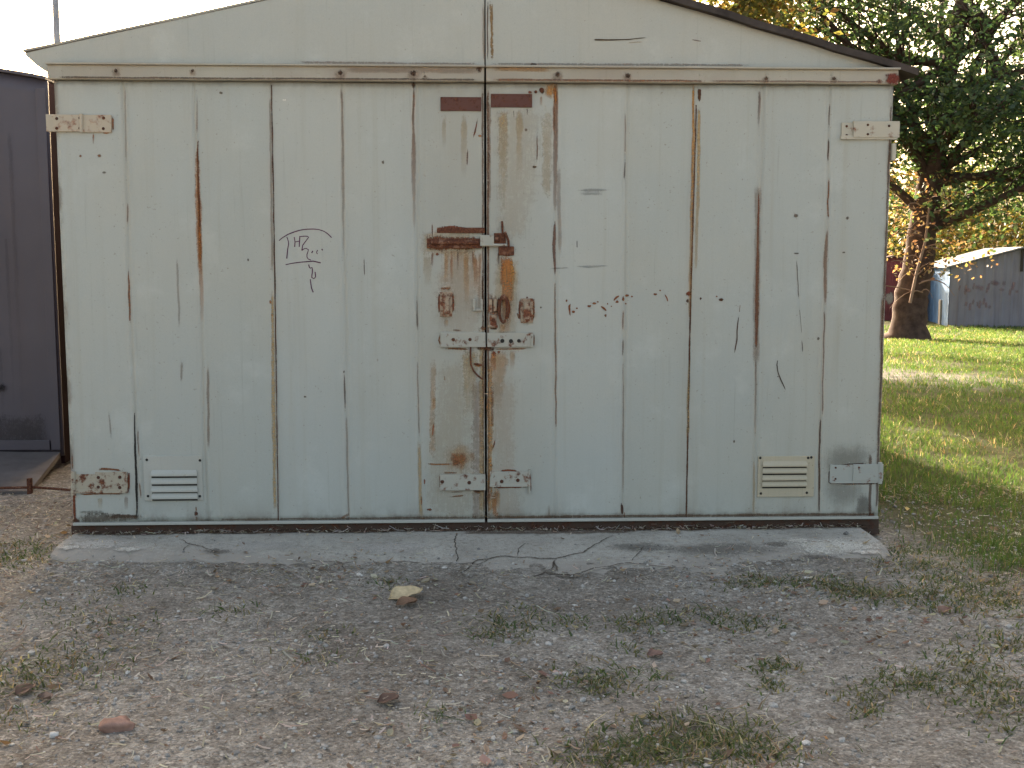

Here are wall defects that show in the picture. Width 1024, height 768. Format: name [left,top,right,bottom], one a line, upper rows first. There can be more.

rust [62,1,878,535]
rust [877,140,891,464]
crack [454,534,704,577]